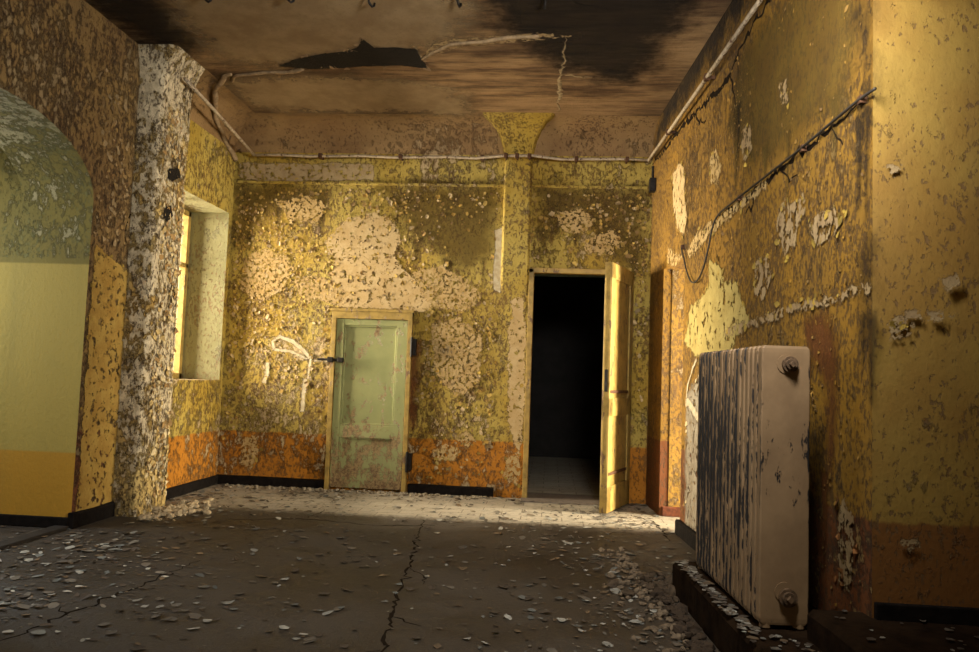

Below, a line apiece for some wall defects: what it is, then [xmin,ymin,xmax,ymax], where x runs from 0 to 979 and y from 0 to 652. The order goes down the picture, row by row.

crack [556,40,585,111]
peeling [221,160,527,488]
crack [292,509,427,652]